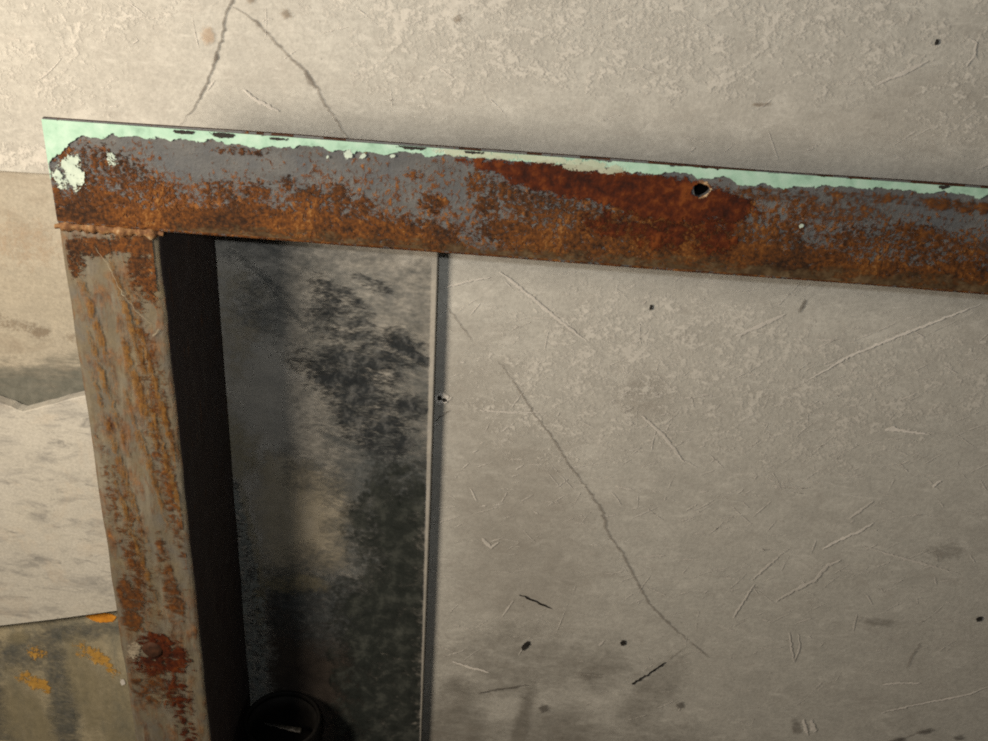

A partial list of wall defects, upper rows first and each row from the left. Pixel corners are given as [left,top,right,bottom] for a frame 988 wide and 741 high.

crack [179,0,233,126]
peeling [41,119,988,199]
damp [251,264,429,741]
rust [52,138,988,741]